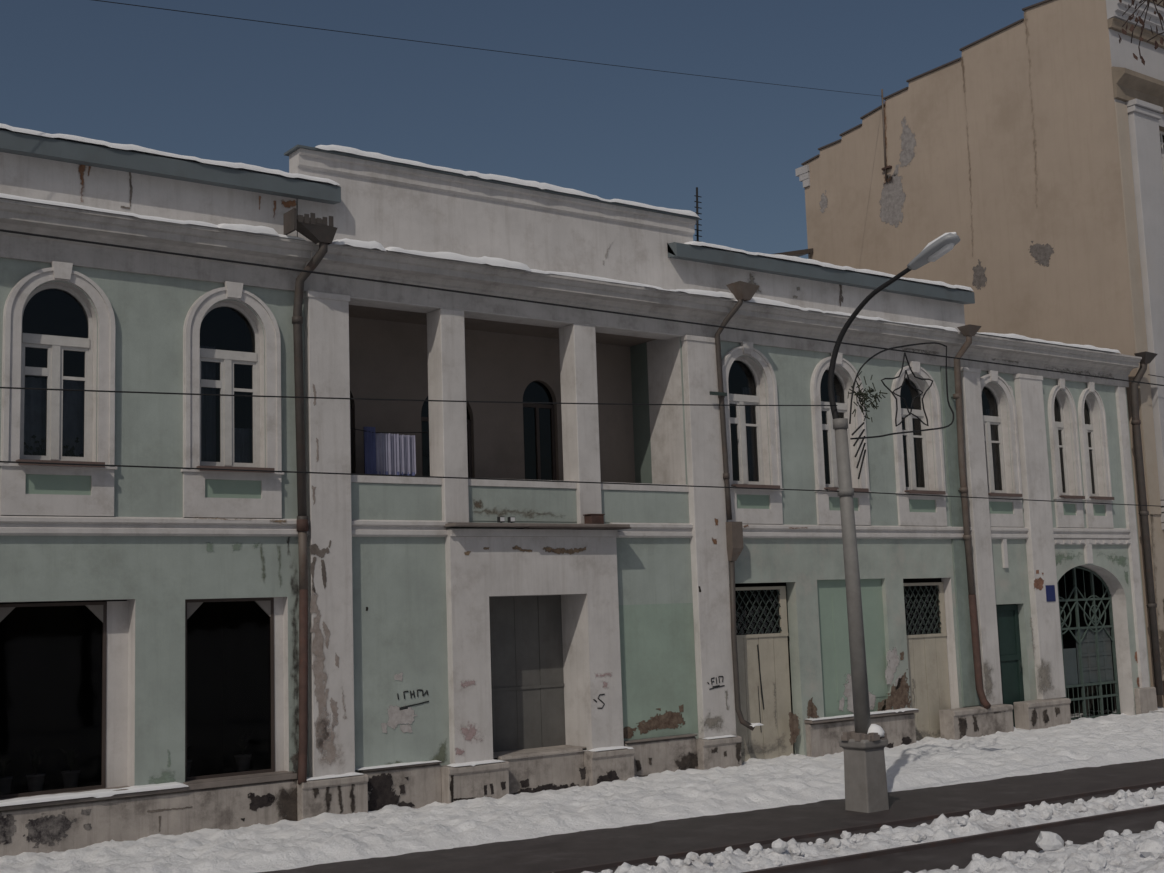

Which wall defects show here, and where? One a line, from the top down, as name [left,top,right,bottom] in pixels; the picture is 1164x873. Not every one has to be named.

rust [78,165,91,202]
peeling [879,116,917,228]
flaking render [1029,241,1054,267]
flaking render [972,259,987,290]
peeling [310,588,339,756]
peeling [839,674,854,713]
peeling [869,648,911,711]
flaking render [623,705,685,739]